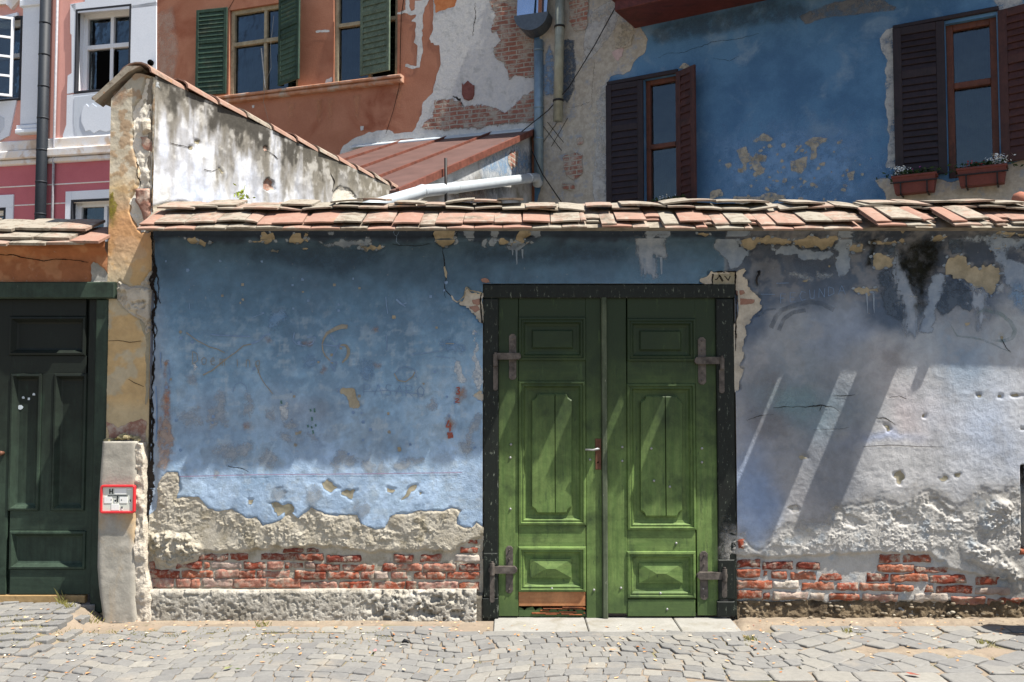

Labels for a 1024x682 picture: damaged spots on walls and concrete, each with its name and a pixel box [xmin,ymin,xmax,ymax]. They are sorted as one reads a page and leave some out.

flaking render [130,78,168,232]
flaking render [340,0,648,204]
peeling [876,28,1024,201]
crack [0,254,84,262]
peeling [736,231,908,327]
water stain [892,240,946,337]
flaking render [937,253,1005,326]
water stain [966,291,990,331]
water stain [964,233,1024,306]
crack [748,395,852,429]
flaking render [106,419,484,622]
flaking render [729,473,1024,619]